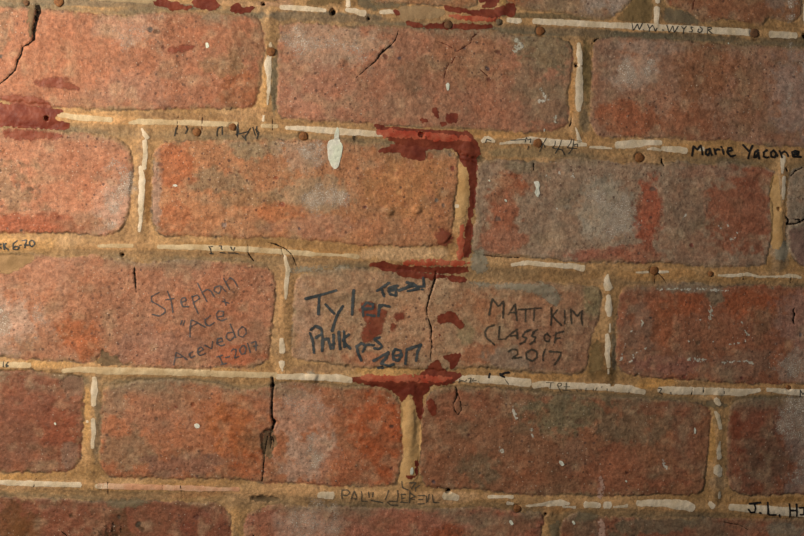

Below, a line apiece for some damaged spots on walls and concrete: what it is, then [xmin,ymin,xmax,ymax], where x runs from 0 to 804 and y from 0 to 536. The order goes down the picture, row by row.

crack [0,5,41,84]
crack [356,31,398,78]
crack [426,273,437,358]
crack [261,377,276,481]